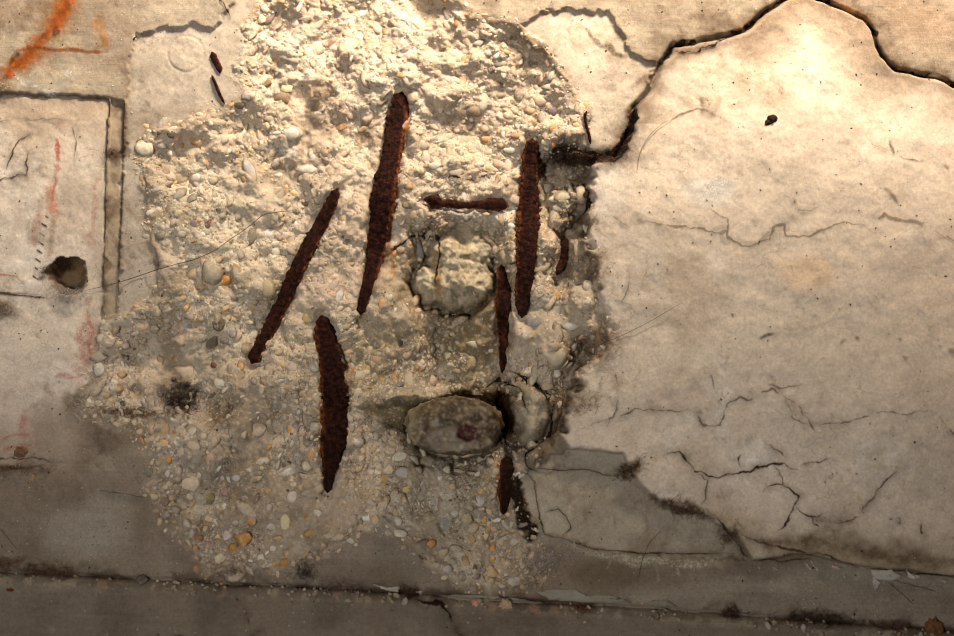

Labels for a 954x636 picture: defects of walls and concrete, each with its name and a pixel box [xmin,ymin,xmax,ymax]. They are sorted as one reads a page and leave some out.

rust [3,0,108,78]
crack [650,0,787,82]
crack [815,0,954,88]
crack [0,136,28,181]
crack [550,103,640,232]
crack [654,210,855,247]
crack [878,212,954,241]
crack [0,291,44,299]
spalling [64,0,751,604]
crack [610,375,906,430]
crack [486,372,709,555]
crack [672,446,954,576]